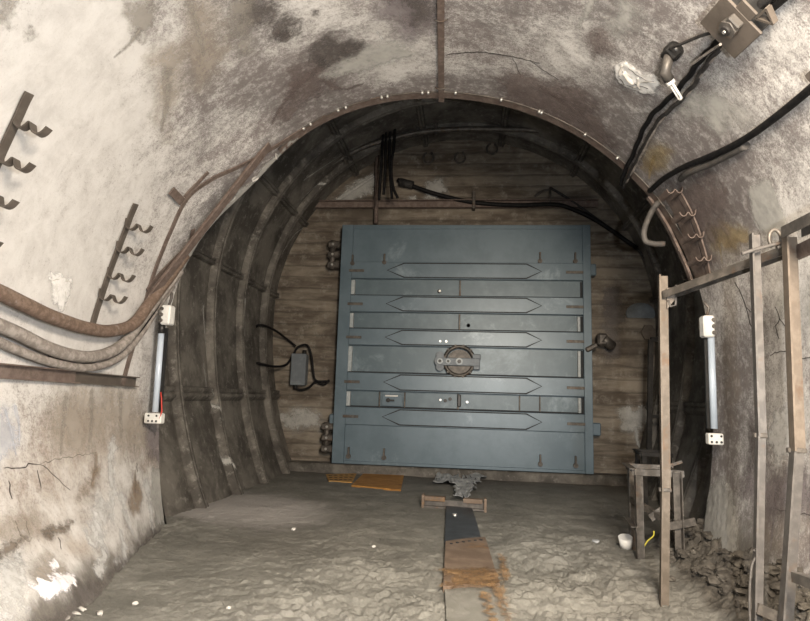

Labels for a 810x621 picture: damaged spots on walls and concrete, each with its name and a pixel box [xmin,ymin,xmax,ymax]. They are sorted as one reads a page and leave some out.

leakage [117,0,154,55]
leakage [229,0,300,52]
leakage [272,0,434,123]
flaking render [49,273,73,311]
crack [5,452,96,498]